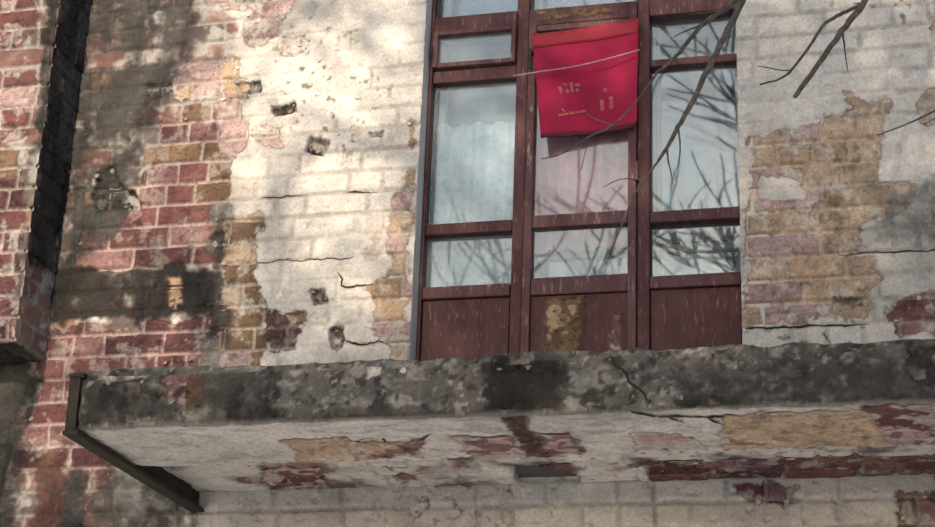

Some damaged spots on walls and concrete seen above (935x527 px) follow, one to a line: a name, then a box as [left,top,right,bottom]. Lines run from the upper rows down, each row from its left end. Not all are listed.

peeling [204,0,302,57]
water stain [51,0,103,271]
peeling [0,70,42,342]
peeling [742,90,918,332]
water stain [133,281,170,325]
peeling [15,54,330,517]
crack [257,257,371,291]
crack [345,337,389,346]
water stain [484,359,568,410]
crack [610,355,735,426]
peeling [884,289,935,386]
peeling [628,395,935,509]